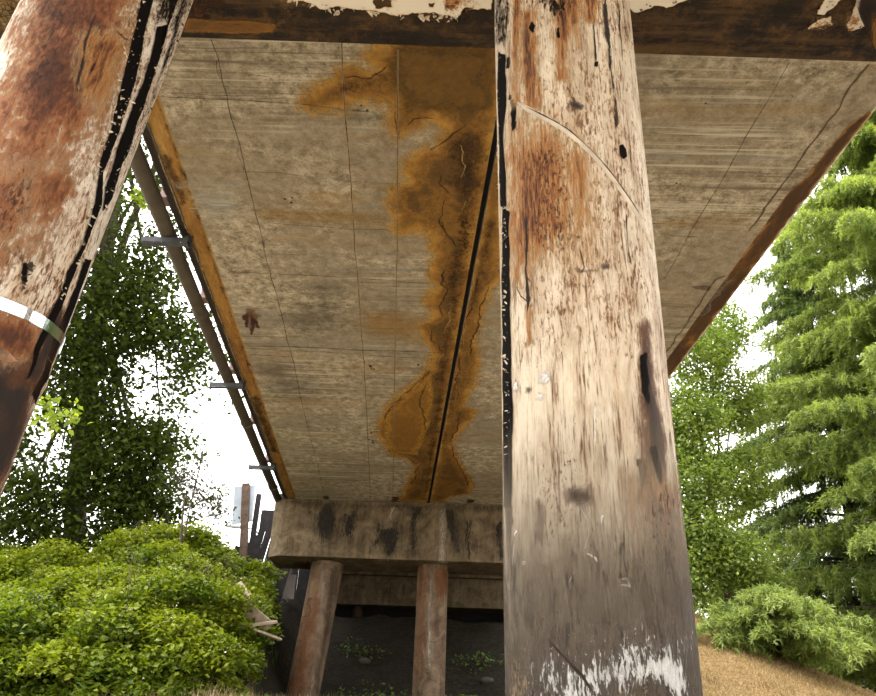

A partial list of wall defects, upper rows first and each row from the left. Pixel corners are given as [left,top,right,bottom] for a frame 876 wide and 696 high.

corrosion [0,0,283,498]
damp [142,44,504,560]
peeling [529,0,572,38]
corrosion [499,0,703,696]
peeling [629,0,695,17]
peeling [847,4,864,31]